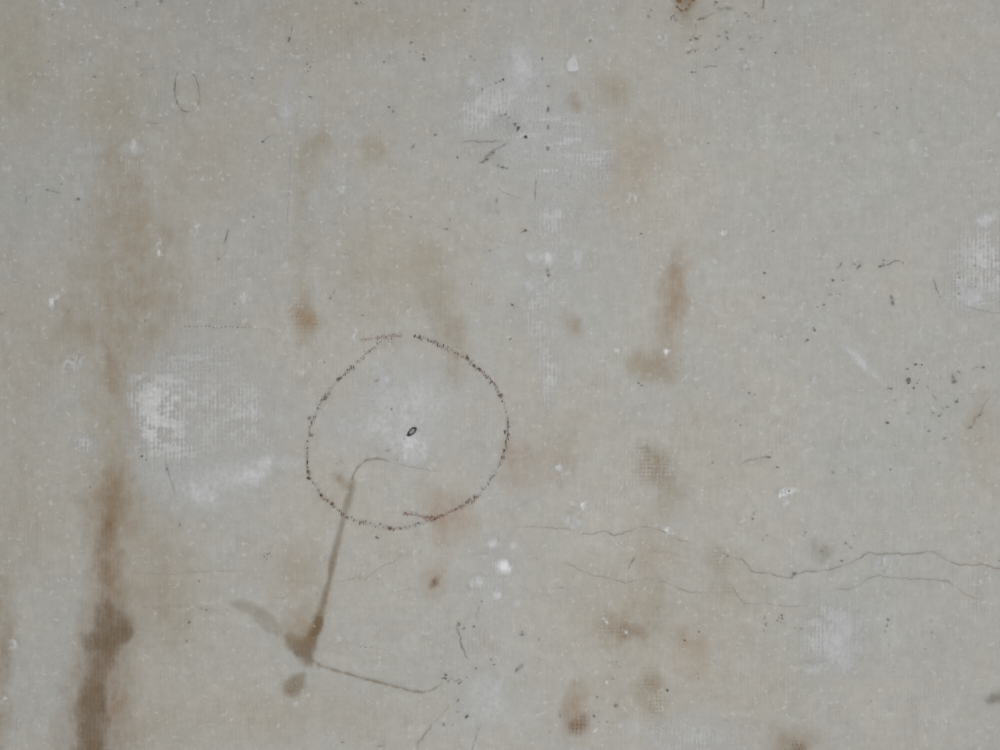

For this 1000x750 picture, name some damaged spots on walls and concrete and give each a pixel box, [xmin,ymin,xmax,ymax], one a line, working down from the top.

leakage [294,551,336,660]